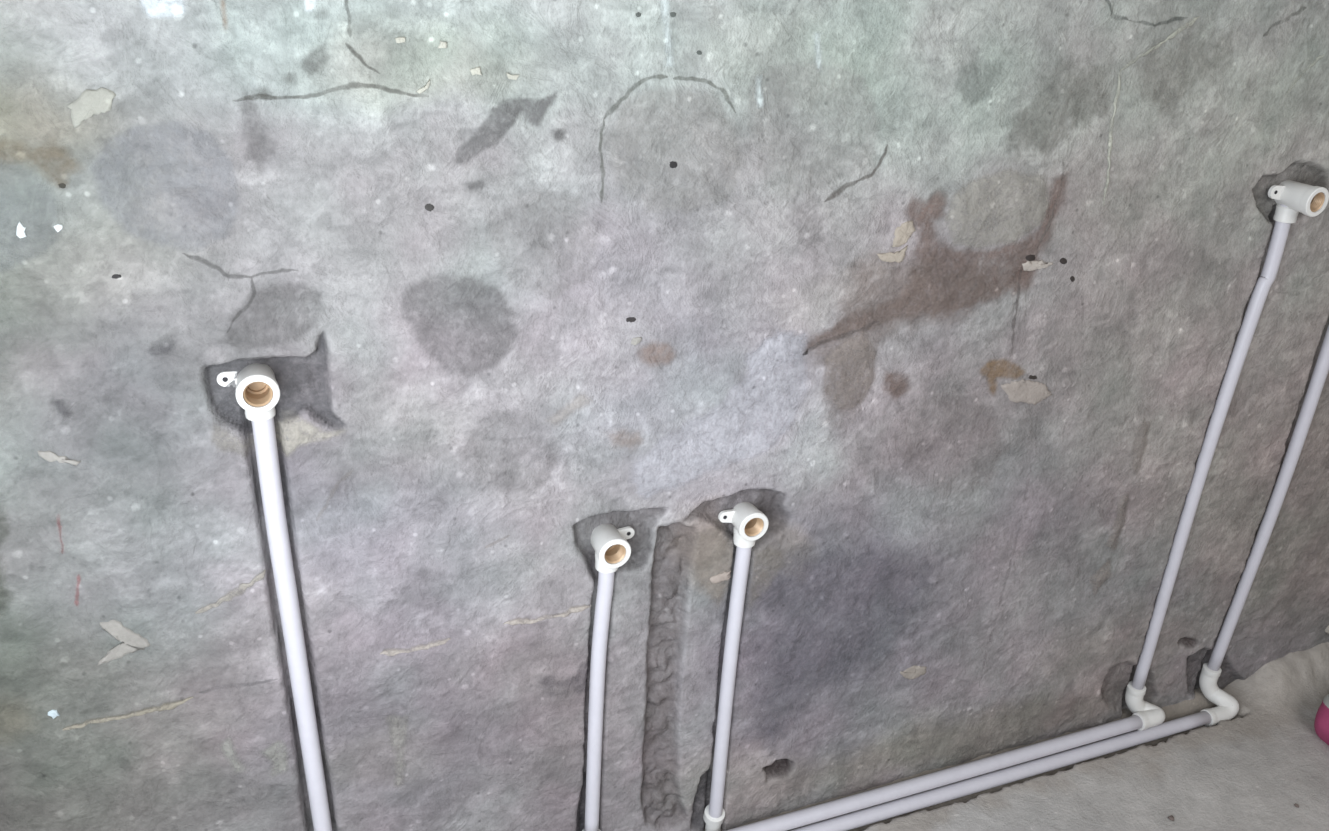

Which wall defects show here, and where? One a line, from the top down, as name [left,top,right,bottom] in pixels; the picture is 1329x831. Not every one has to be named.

water stain [458,97,553,161]
water stain [703,178,1329,831]
water stain [582,524,635,831]